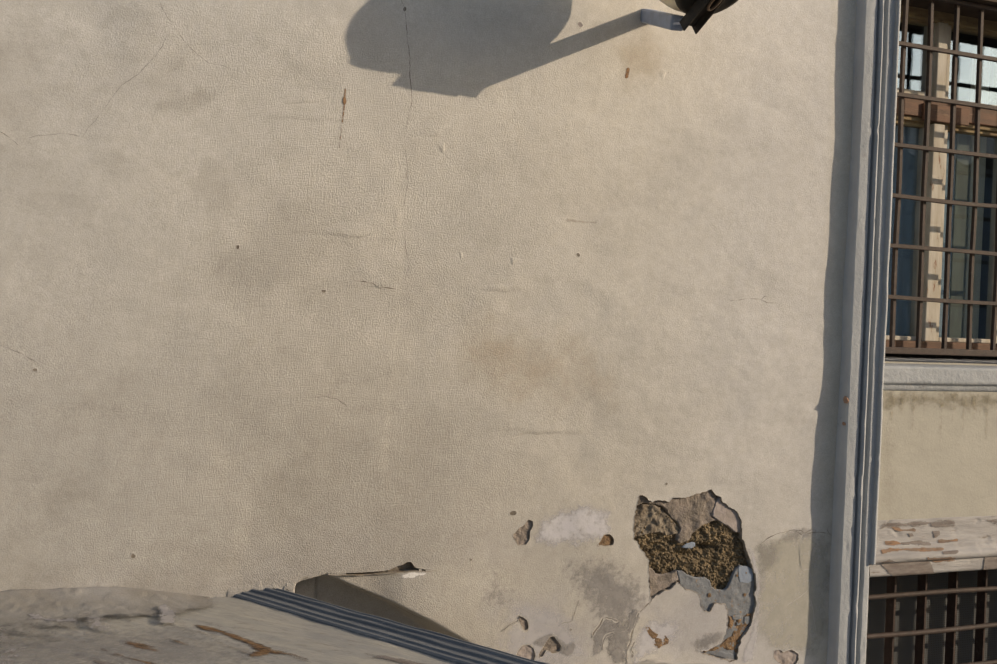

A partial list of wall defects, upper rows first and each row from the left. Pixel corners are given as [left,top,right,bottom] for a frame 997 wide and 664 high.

crack [401,0,412,205]
peeling [508,509,533,546]
water stain [536,506,610,546]
peeling [596,534,614,547]
flaking render [633,490,757,663]
peeling [881,526,958,576]
peeling [982,557,997,570]
peeling [517,616,529,632]
peeling [517,628,575,660]
water stain [569,565,675,663]
peeling [593,611,669,663]